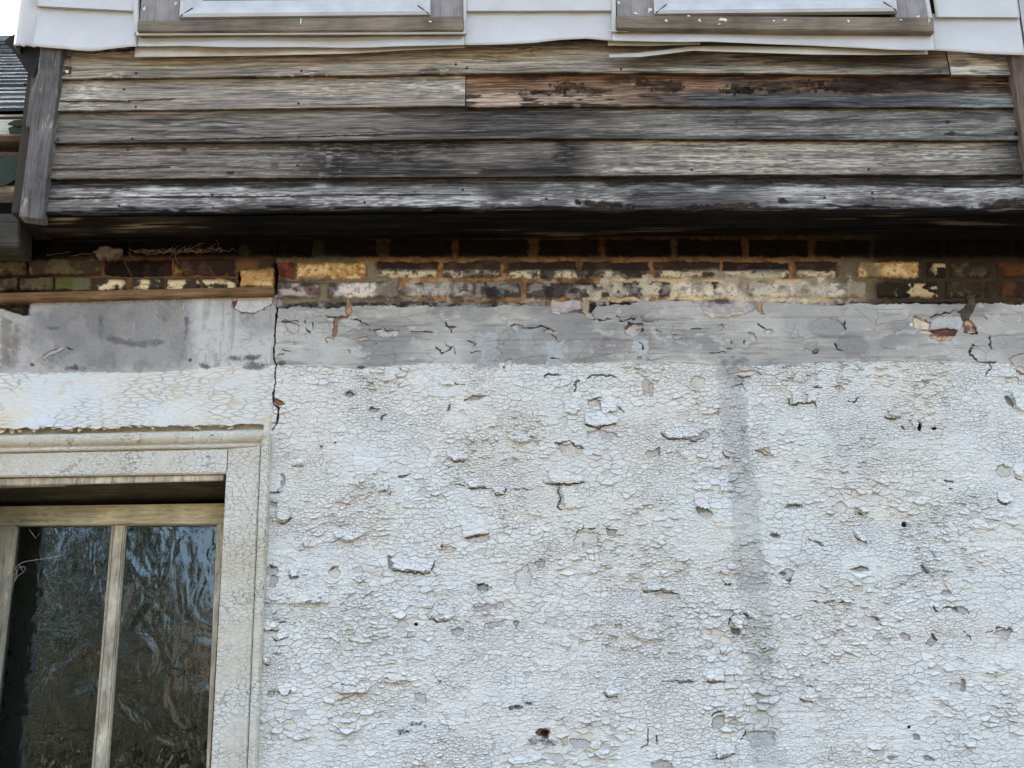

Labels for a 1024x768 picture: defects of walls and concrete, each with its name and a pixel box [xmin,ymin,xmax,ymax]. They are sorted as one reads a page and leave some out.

flaking render [0,233,1024,342]
crack [272,297,284,431]
peeling [1004,389,1024,410]
peeling [563,399,620,430]
peeling [645,425,710,457]
peeling [548,443,587,510]
peeling [694,493,713,518]
peeling [461,522,490,542]
peeling [388,546,456,575]
peeling [473,601,519,629]
peeling [729,610,762,635]
peeling [933,590,969,615]